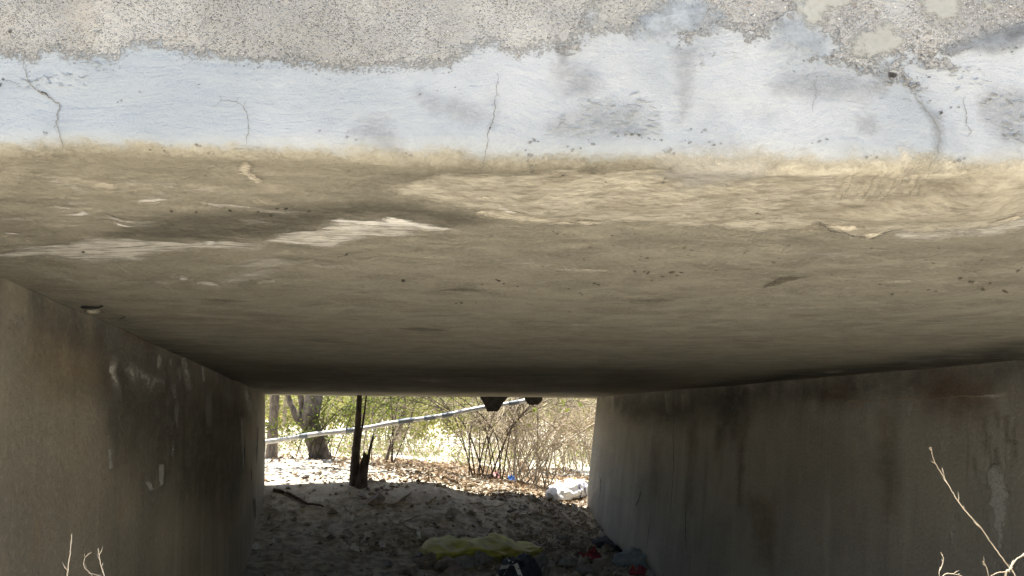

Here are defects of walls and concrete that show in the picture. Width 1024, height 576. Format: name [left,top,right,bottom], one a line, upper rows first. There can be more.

crack [22,60,63,149]
flaking render [0,0,674,87]
crack [482,75,499,167]
flaking render [674,0,1024,140]
crack [914,94,972,152]